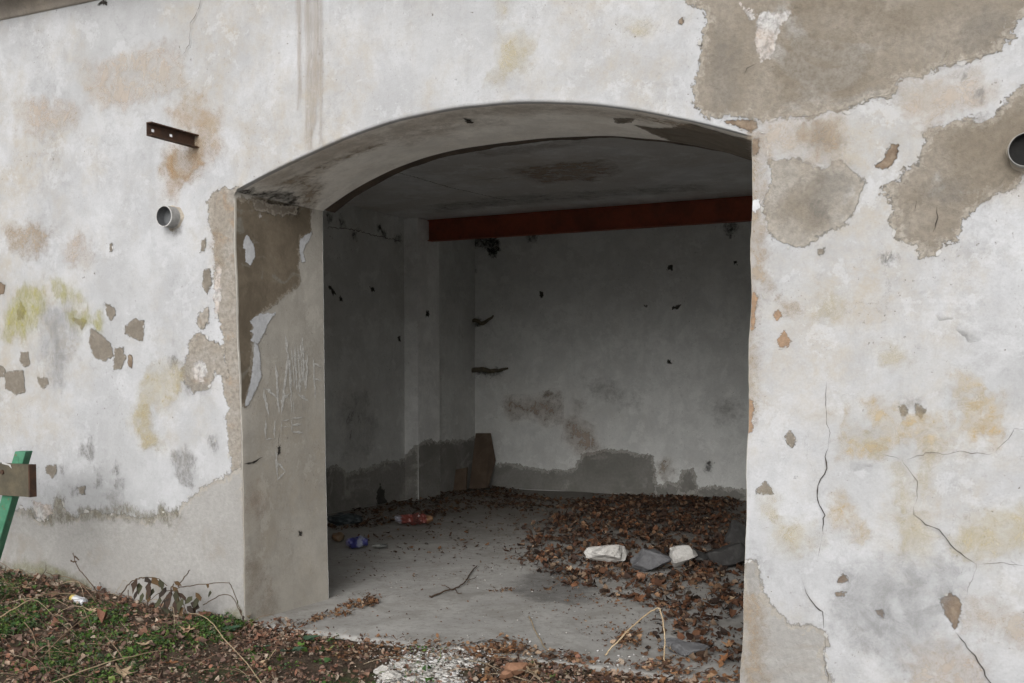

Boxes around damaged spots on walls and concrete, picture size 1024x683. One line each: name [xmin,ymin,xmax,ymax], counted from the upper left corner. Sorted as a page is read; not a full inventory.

spalling [613,0,1024,331]
peeling [0,182,322,622]
crack [817,393,830,555]
crack [883,430,1015,599]
peeling [740,559,832,683]
crack [802,581,830,679]
crack [957,634,991,683]